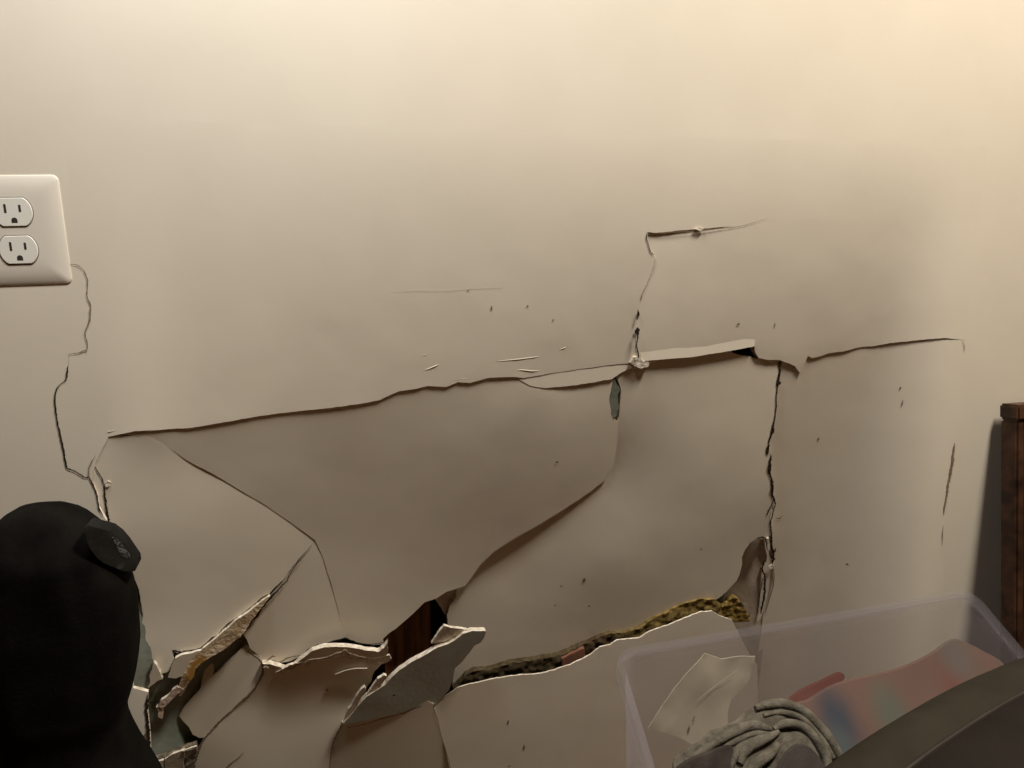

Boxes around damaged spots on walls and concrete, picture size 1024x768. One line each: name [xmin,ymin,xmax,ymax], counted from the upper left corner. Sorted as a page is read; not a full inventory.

crack [635,219,764,358]
crack [54,264,111,522]
peeling [516,339,755,418]
crack [757,362,782,614]
crack [942,443,955,545]
peeling [134,581,270,755]
crack [194,551,391,768]
spalling [328,638,382,648]
peeling [335,664,387,721]
spalling [430,589,467,646]
spalling [716,538,772,688]